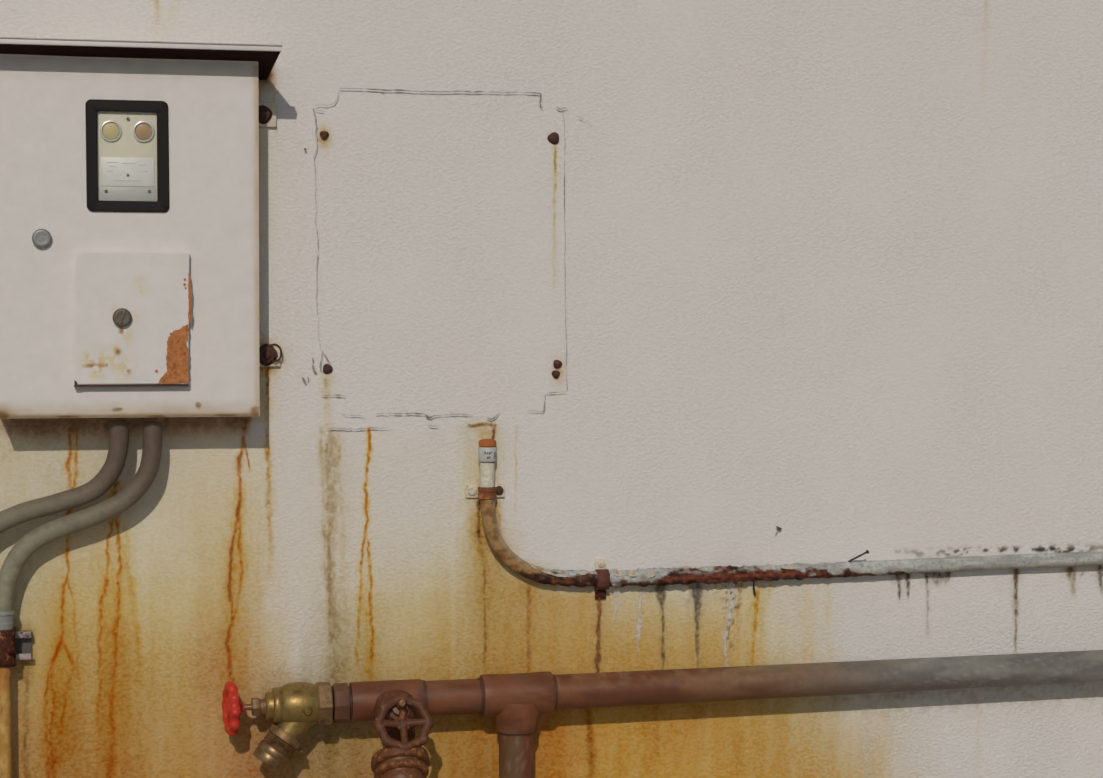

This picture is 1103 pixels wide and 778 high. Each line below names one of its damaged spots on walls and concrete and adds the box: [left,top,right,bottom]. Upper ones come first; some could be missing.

crack [313,88,591,430]